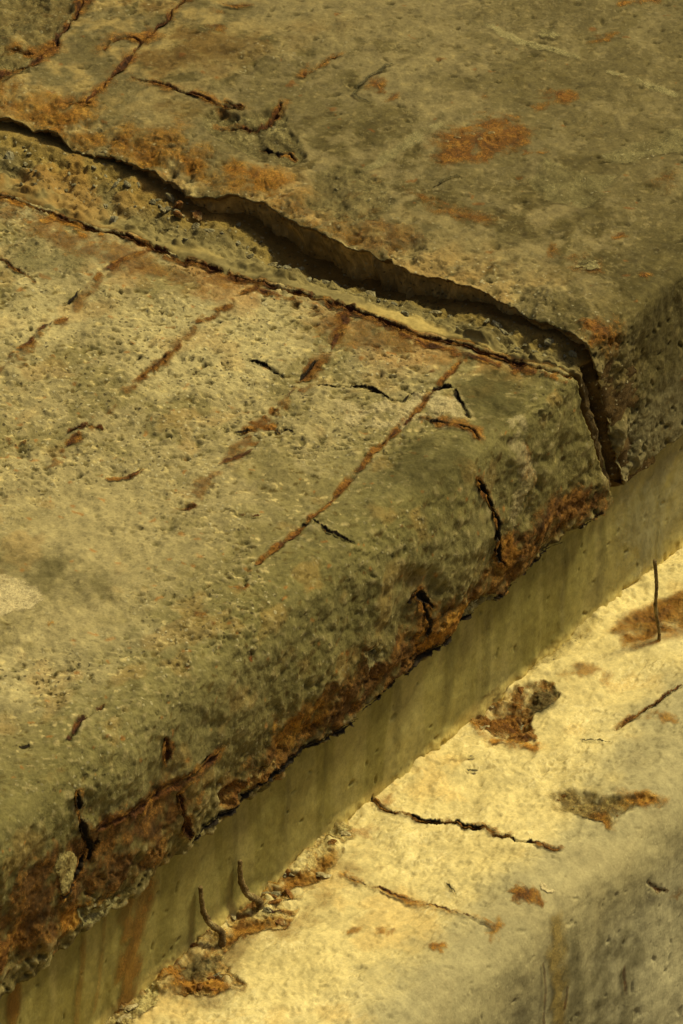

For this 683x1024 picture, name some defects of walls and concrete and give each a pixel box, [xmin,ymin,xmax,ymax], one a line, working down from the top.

crack [0,0,656,489]
corrosion [12,247,303,353]
corrosion [255,303,568,565]
crack [177,477,604,843]
corrosion [224,483,608,788]
spalling [471,679,561,752]
crack [580,684,681,742]
spalling [55,851,78,896]
spalling [105,821,355,1024]
crack [371,797,563,852]
corrosion [509,884,544,907]
spalling [551,788,667,828]